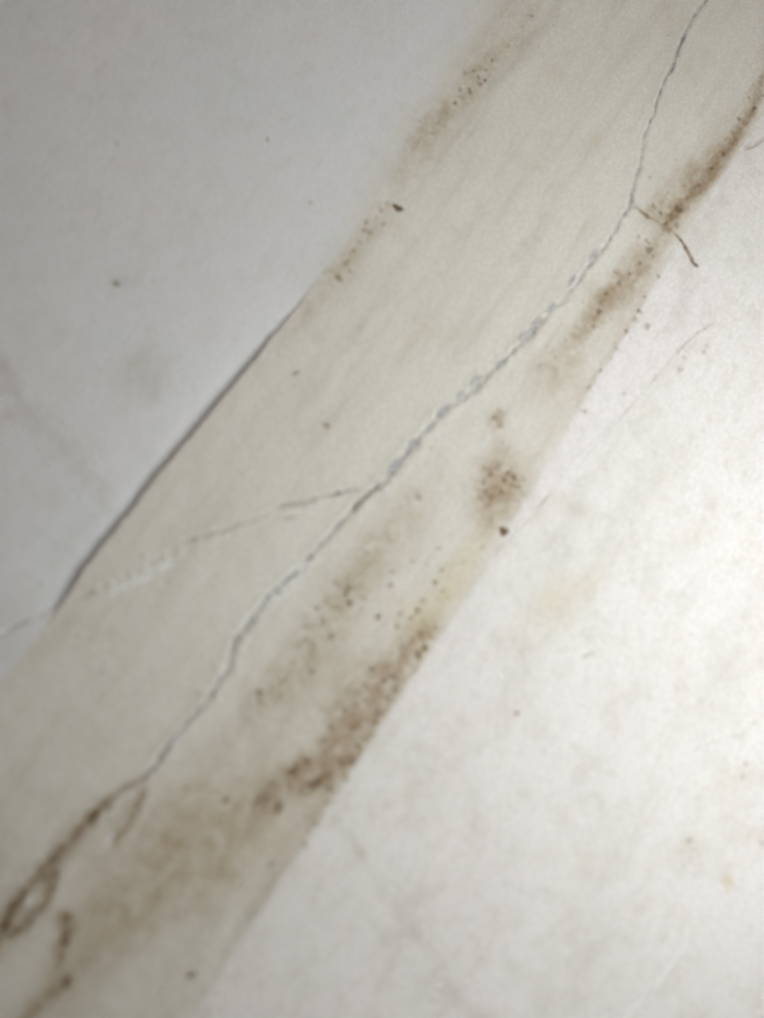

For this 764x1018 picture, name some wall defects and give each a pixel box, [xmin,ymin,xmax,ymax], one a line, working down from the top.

crack [353,305,553,508]
crack [105,558,174,595]
crack [22,894,34,909]